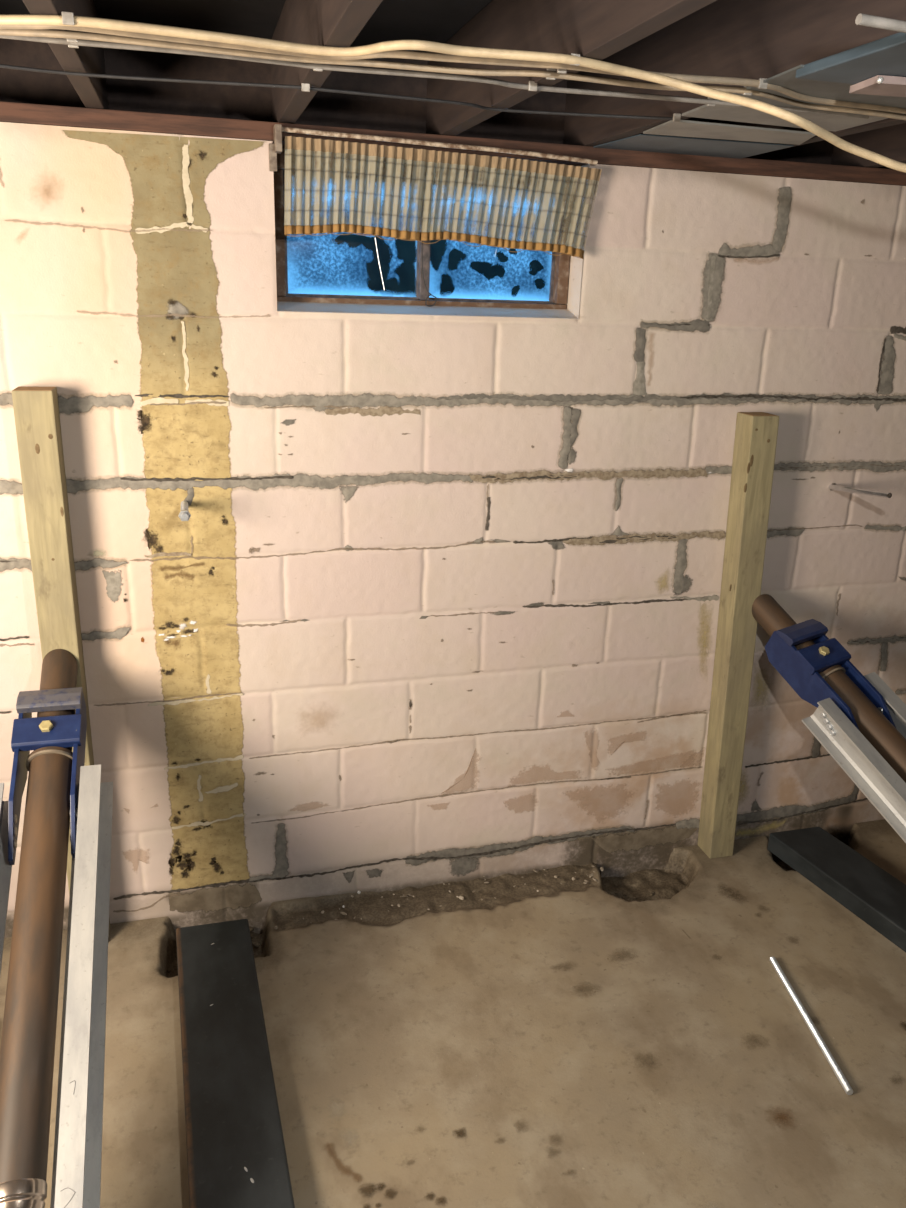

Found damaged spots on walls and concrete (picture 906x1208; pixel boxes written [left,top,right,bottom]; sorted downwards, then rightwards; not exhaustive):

crack [0,393,13,405]
crack [58,187,906,619]
crack [0,480,23,494]
crack [0,558,32,571]
crack [226,619,309,627]